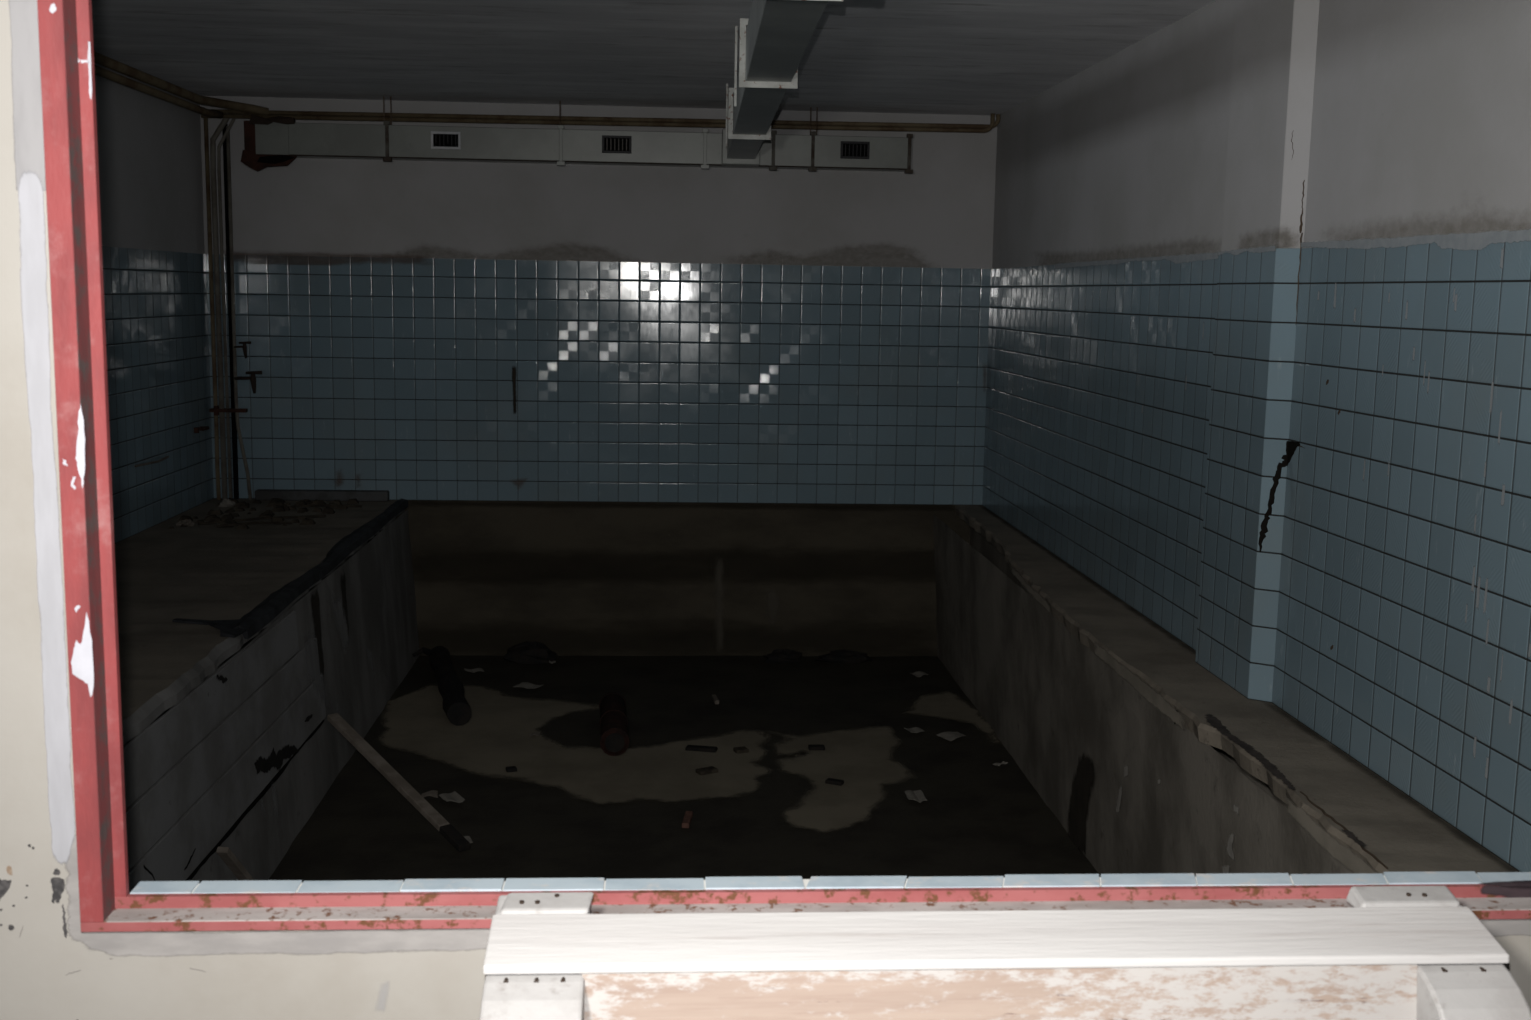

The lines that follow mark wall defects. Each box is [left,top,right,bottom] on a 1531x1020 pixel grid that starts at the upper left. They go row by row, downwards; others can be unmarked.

peeling [78,42,92,100]
peeling [63,405,85,490]
crack [1258,441,1304,552]
peeling [71,605,94,697]
spalling [0,866,29,931]
spalling [51,869,65,903]